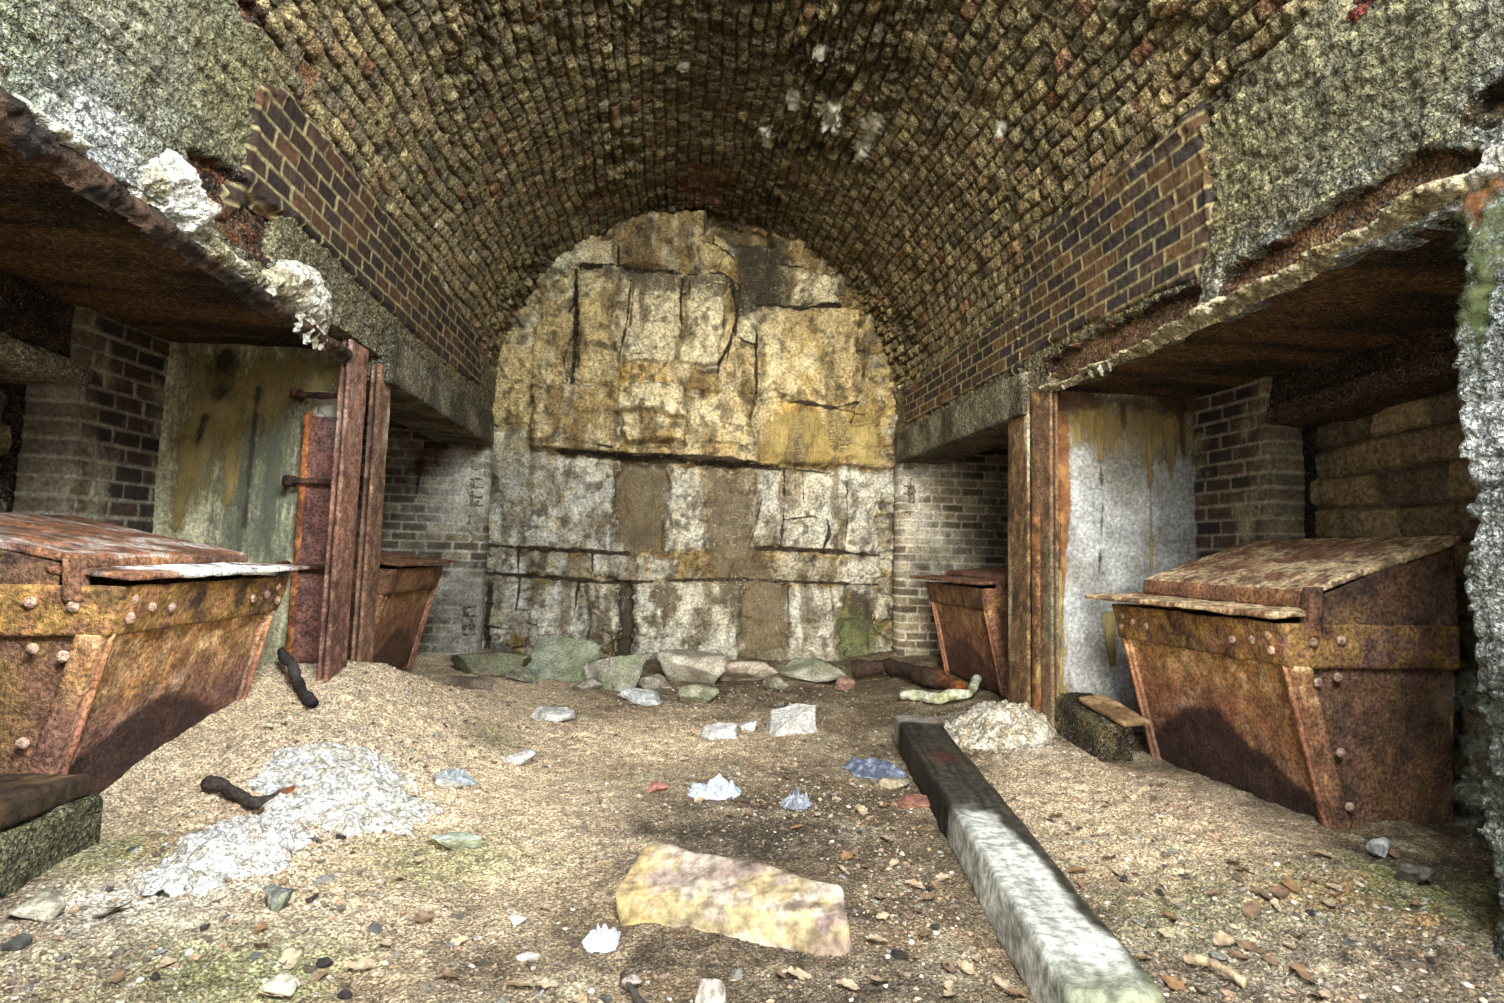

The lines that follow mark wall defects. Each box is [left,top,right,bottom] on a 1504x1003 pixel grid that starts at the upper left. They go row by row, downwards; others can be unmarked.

rust [0,86,353,364]
leakage [171,349,281,555]
leakage [316,399,337,417]
crack [563,236,863,415]
efflorescence [759,125,773,148]
efflorescence [785,87,802,111]
efflorescence [812,45,826,62]
efflorescence [818,95,885,162]
efflorescence [994,119,1006,138]
rust [1032,452,1041,714]
rust [1058,391,1196,616]
flaking render [904,71,1504,424]